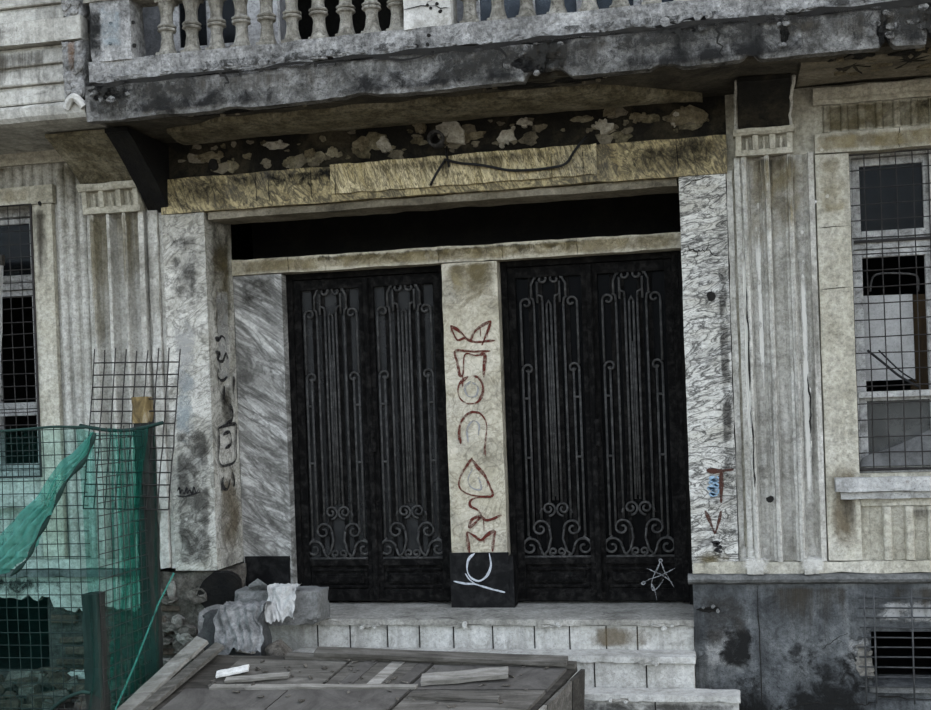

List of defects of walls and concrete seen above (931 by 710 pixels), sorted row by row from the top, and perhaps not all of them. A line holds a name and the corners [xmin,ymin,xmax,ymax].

spalling [159,52,367,75]
spalling [384,34,457,57]
spalling [764,4,859,48]
spalling [827,3,931,76]
spalling [178,105,307,117]
peeling [178,117,548,174]
peeling [560,105,709,144]
leakage [707,598,751,667]
leakage [738,677,768,710]
leakage [779,641,873,710]